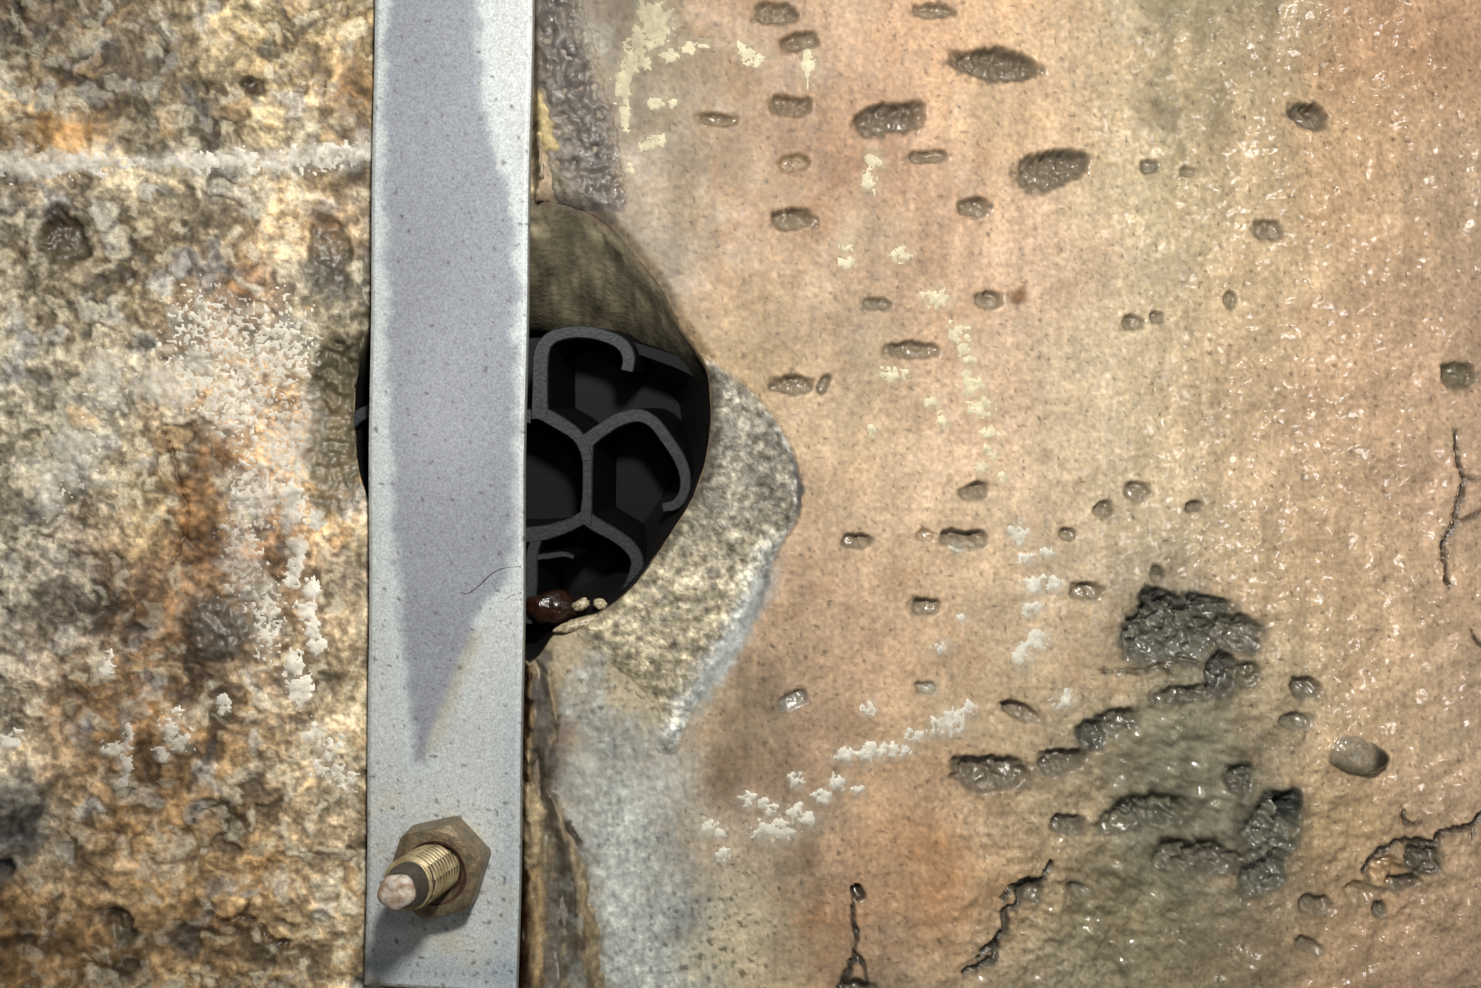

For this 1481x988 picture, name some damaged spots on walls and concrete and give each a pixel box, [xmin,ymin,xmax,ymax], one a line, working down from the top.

damp [610,0,709,174]
damp [735,40,766,67]
damp [800,49,817,90]
damp [0,134,373,185]
spalling [769,375,830,395]
crack [1440,429,1481,589]
spalling [572,597,608,611]
spalling [778,689,807,711]
damp [737,698,976,843]
crack [1361,808,1481,873]
crack [837,897,869,988]
crack [961,860,1054,974]